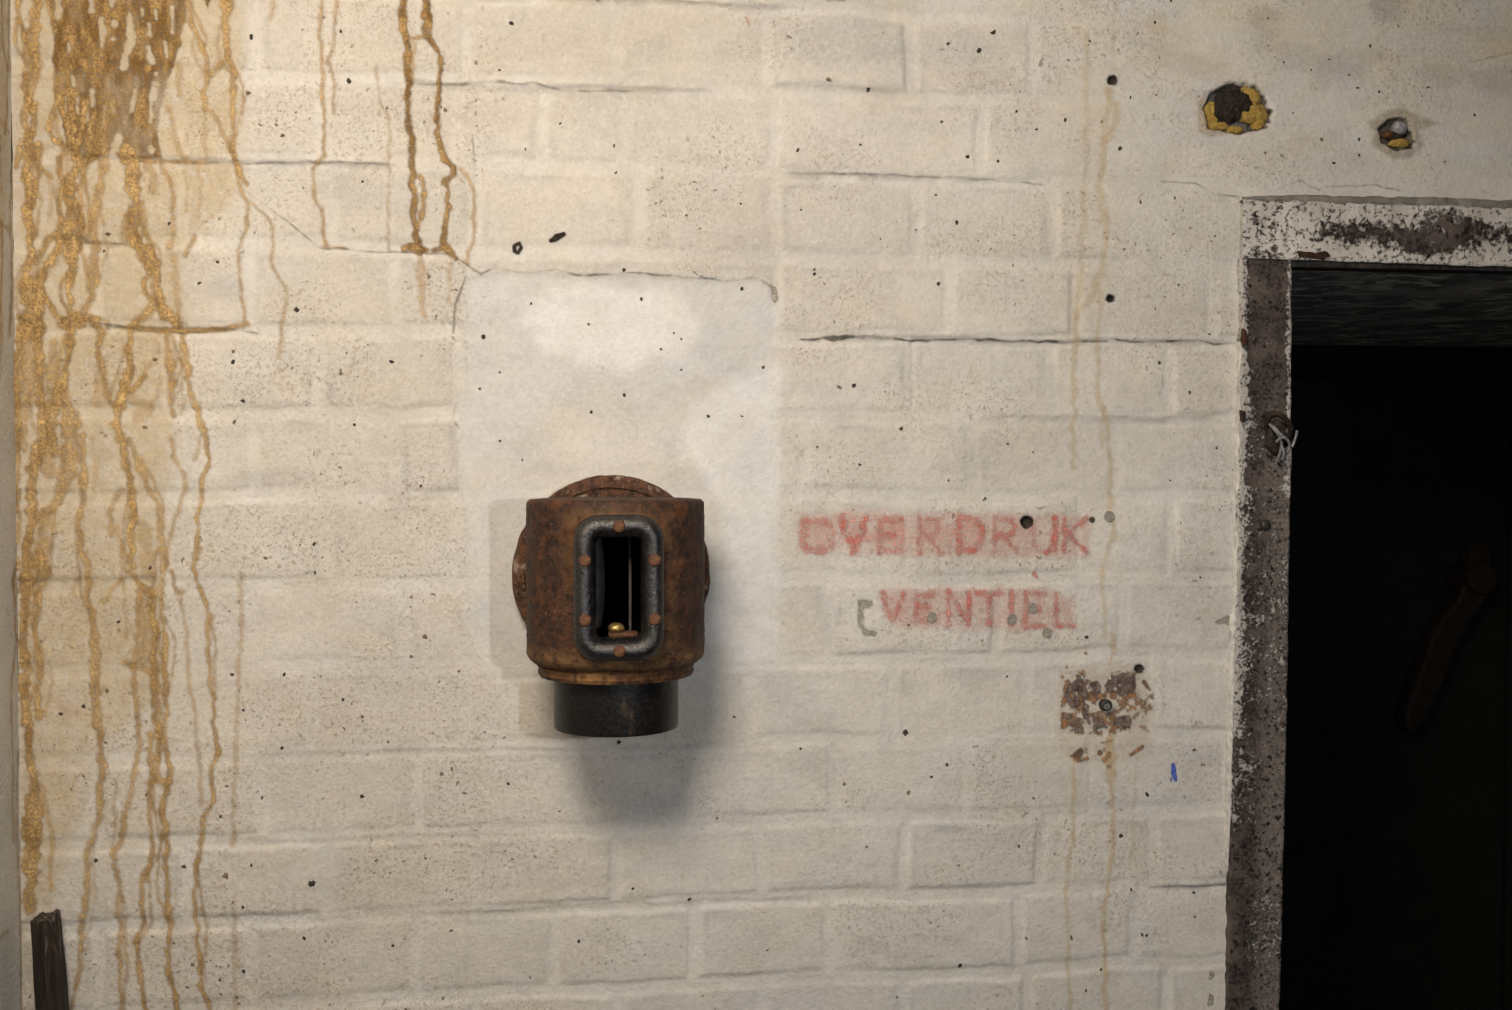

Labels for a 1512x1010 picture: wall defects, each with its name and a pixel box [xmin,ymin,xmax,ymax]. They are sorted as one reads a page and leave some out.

spalling [1199,83,1272,135]
spalling [1358,111,1431,157]
rust [1061,652,1153,768]